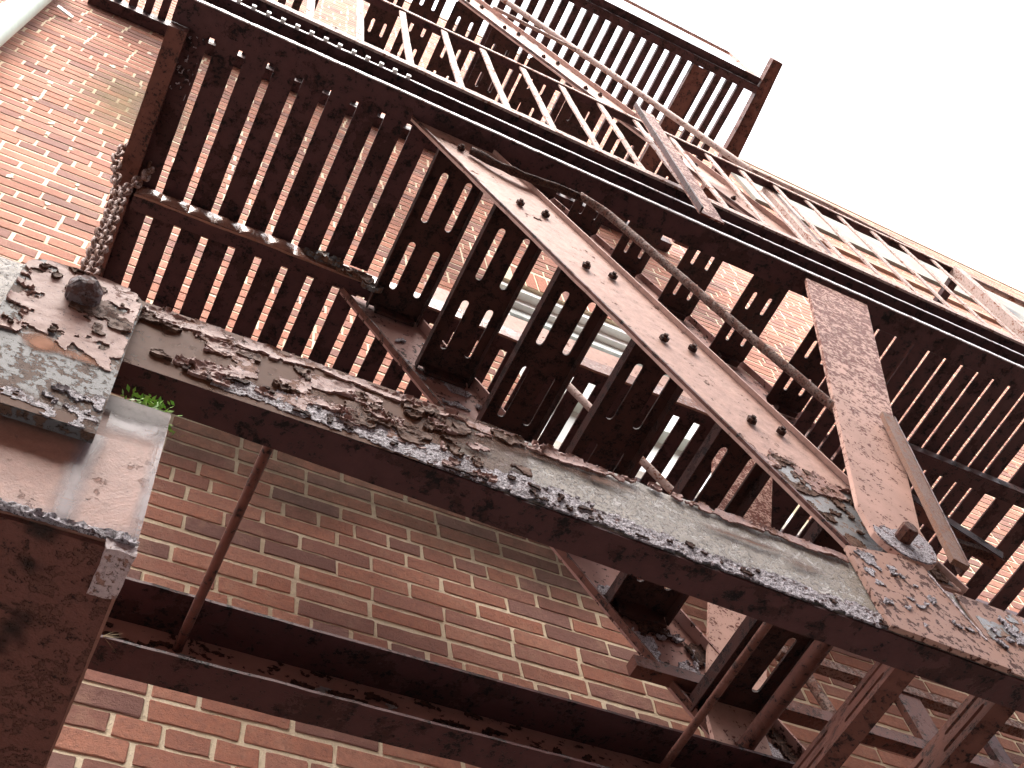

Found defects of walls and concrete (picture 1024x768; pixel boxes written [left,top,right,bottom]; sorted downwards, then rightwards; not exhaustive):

peeling [0,259,953,628]
peeling [597,584,706,674]
peeling [766,726,800,762]